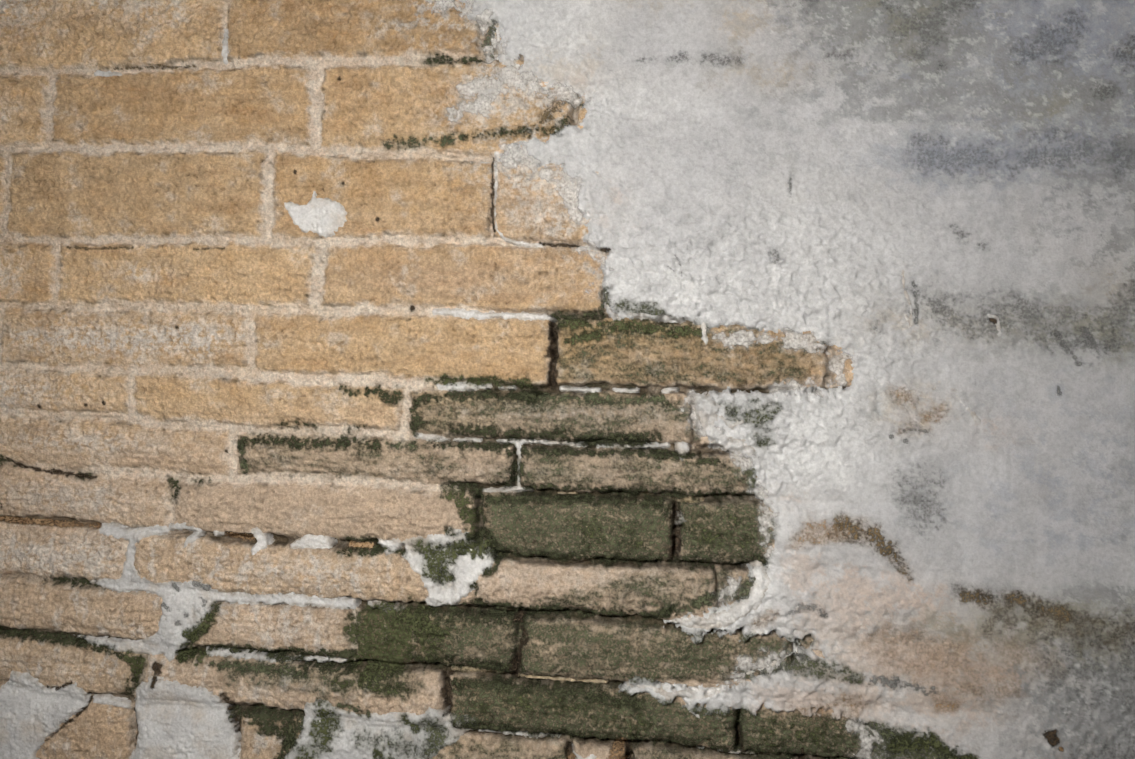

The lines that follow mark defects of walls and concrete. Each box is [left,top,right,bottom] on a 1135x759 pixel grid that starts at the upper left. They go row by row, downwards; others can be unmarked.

peeling [431,0,520,121]
flaking render [604,302,686,324]
water stain [917,291,1097,366]
peeling [453,437,692,461]
flaking render [693,391,755,456]
flaking render [670,482,778,630]
water stain [802,516,913,580]
peeling [283,655,352,663]
water stain [517,672,609,684]
flaking render [626,642,798,718]
water stain [957,585,1134,681]
water stain [860,726,977,759]